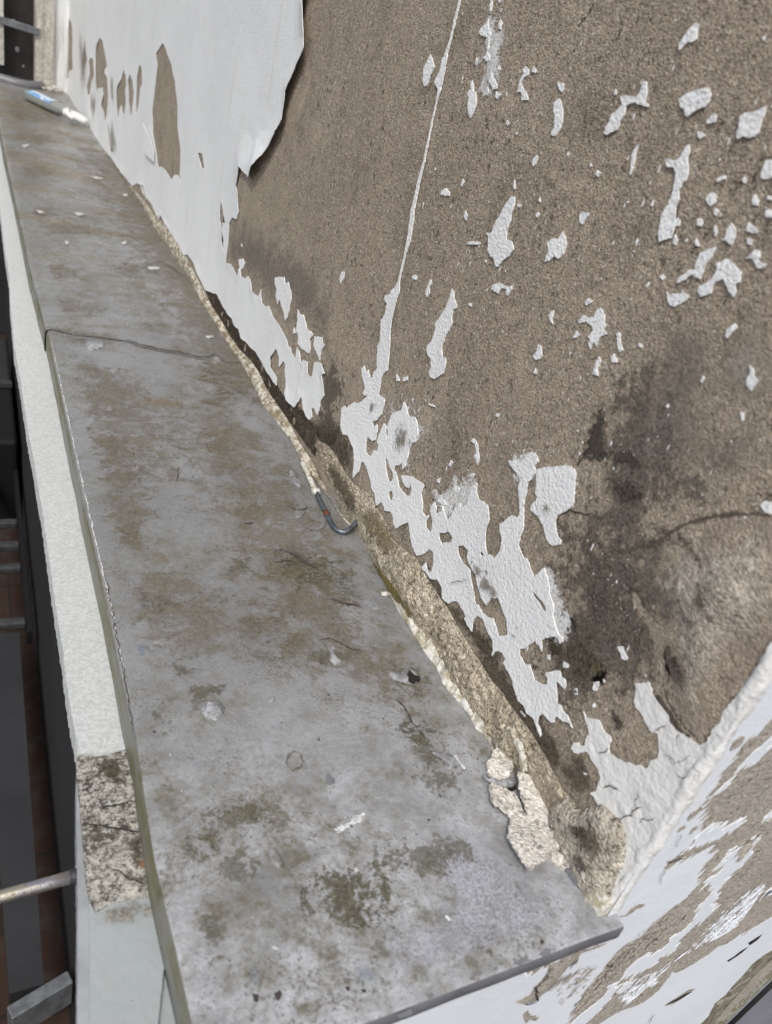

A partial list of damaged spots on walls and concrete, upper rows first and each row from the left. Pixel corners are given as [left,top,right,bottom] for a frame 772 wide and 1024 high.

peeling [67,19,142,119]
peeling [142,44,180,180]
crack [60,329,225,359]
damp [735,346,758,383]
peeling [206,0,772,917]
damp [543,340,717,737]
crack [561,509,770,624]
peeling [515,719,772,1024]